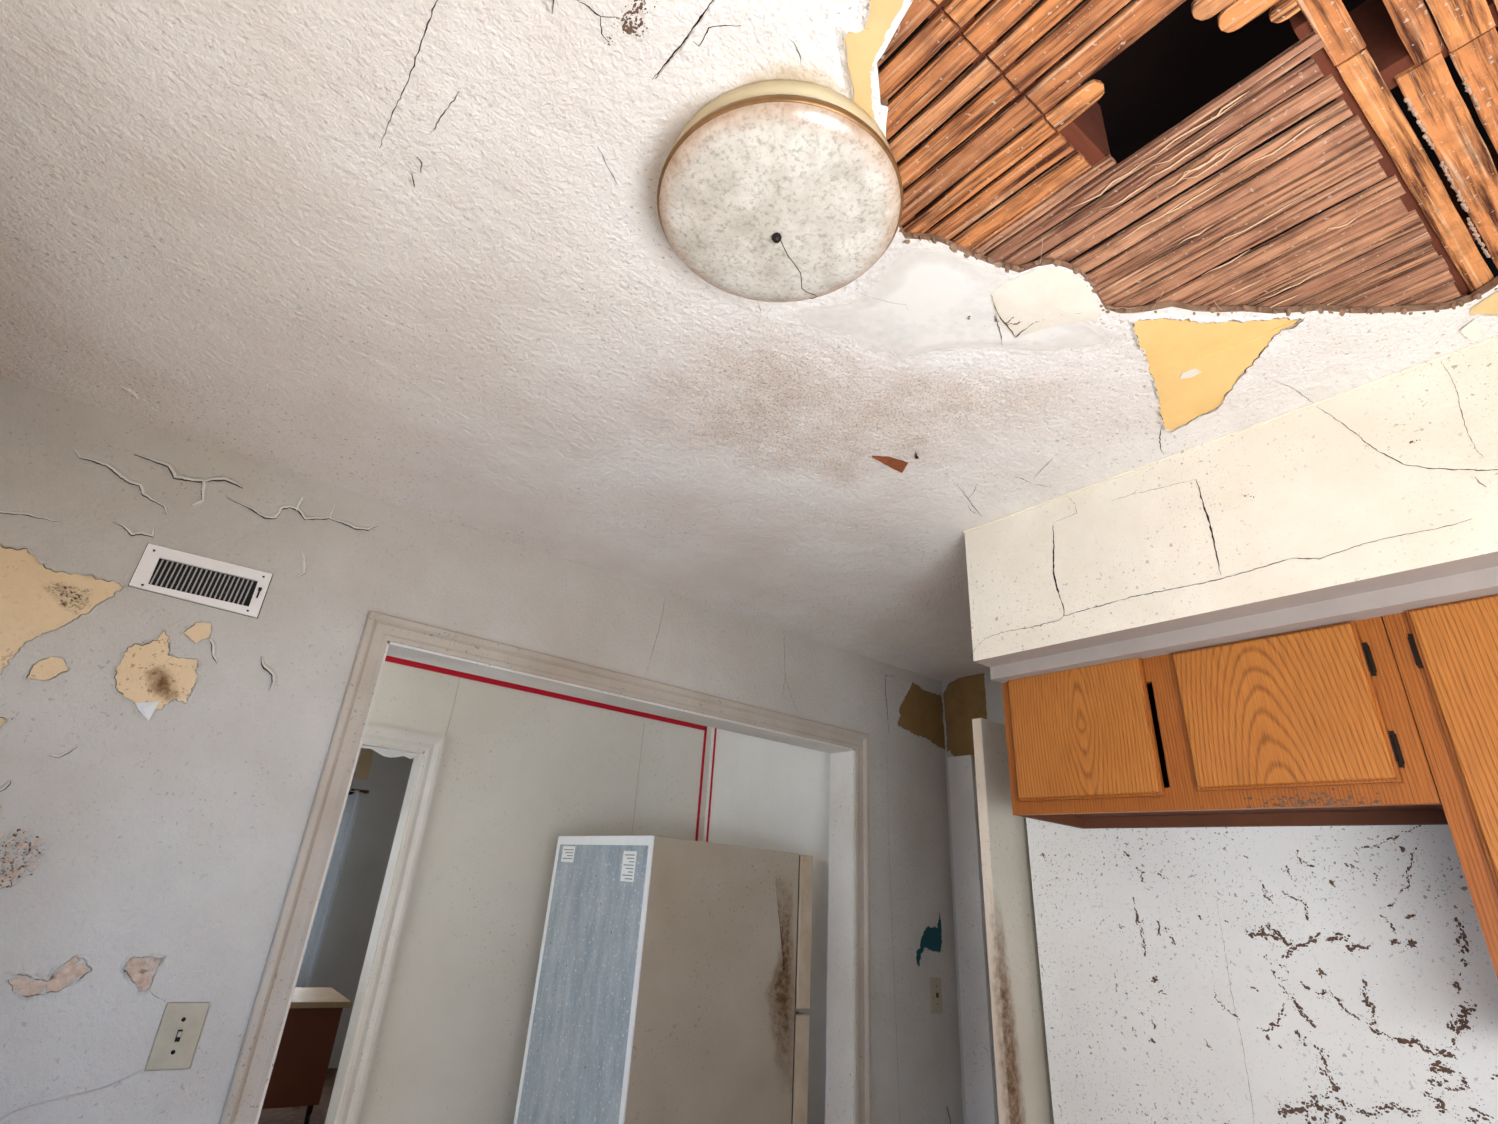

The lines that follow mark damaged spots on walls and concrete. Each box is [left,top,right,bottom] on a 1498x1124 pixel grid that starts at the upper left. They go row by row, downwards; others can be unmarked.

crack [380,0,438,147]
crack [577,0,620,41]
crack [653,0,732,78]
peeling [836,0,904,122]
peeling [1129,314,1306,434]
crack [1276,362,1498,487]
crack [975,426,1470,648]
peeling [0,543,128,684]
peeling [110,619,219,721]
peeling [896,673,989,778]
peeling [2,952,96,1000]
peeling [914,911,943,969]